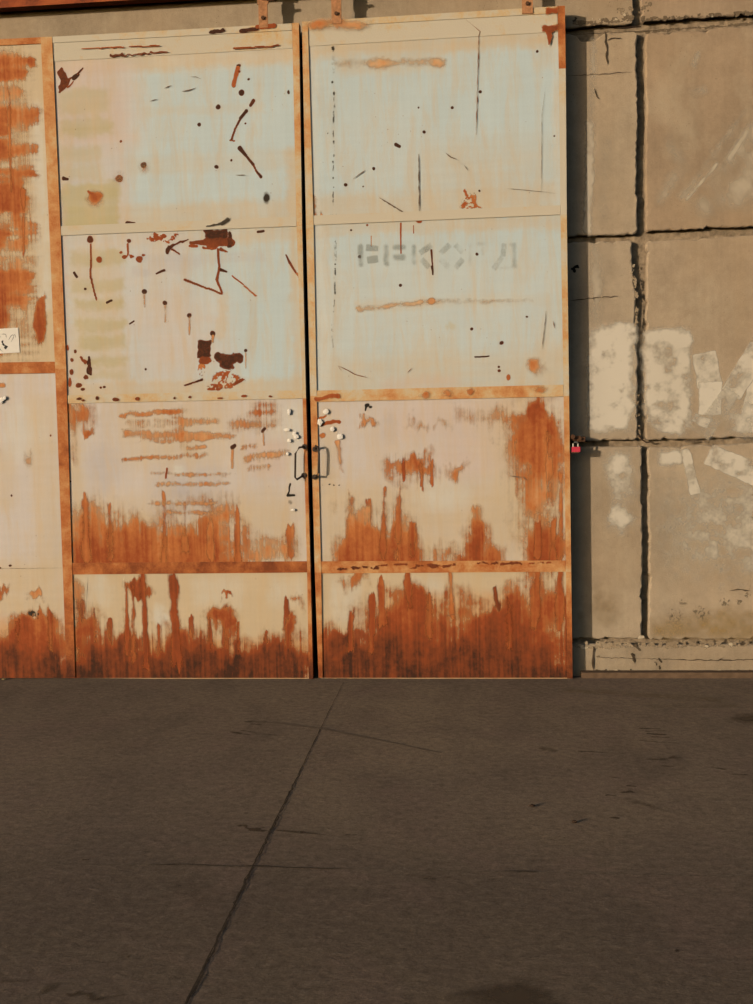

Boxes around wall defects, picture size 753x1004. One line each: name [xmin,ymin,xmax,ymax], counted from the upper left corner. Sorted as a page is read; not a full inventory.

rust [0,51,47,345]
rust [73,236,113,304]
rust [183,248,257,296]
rust [529,359,539,373]
rust [68,403,298,563]
rust [317,415,341,464]
rust [322,387,567,678]
rust [0,574,309,678]
crack [156,763,338,1004]